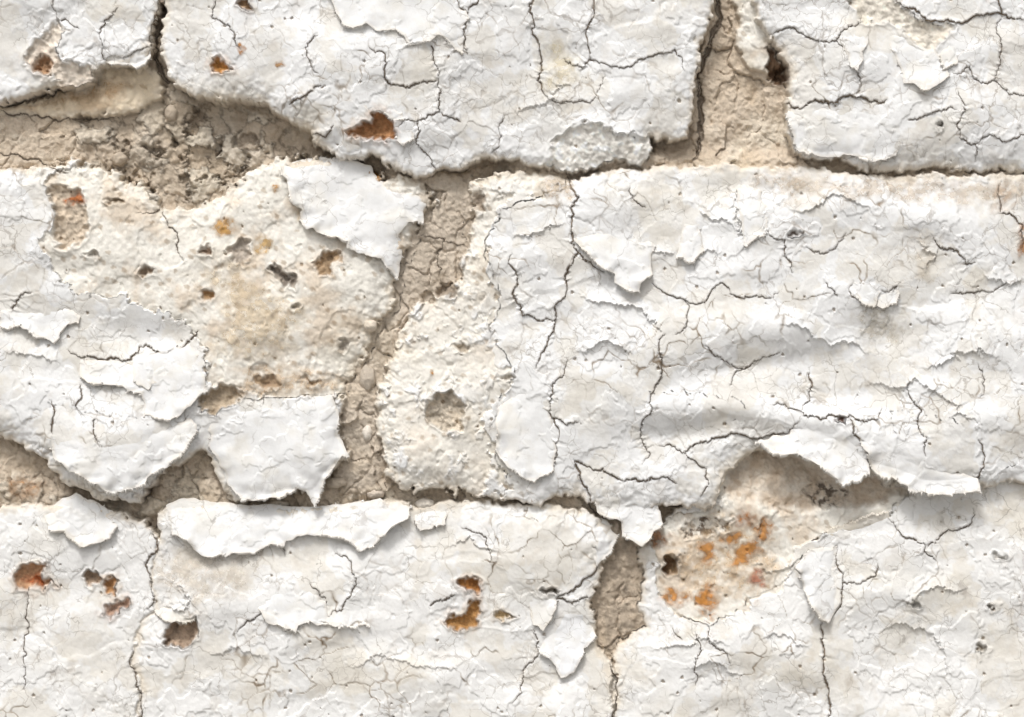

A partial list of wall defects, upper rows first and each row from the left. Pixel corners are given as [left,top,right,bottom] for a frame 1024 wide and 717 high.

crack [369,46,459,168]
crack [529,0,723,159]
spalling [765,48,789,86]
crack [896,0,1024,158]
peeling [0,304,80,344]
peeling [40,81,657,559]
crack [508,173,882,519]
rust [651,531,667,547]
rust [663,588,715,606]
rust [700,543,713,560]
rust [726,513,772,585]
spalling [529,416,982,679]